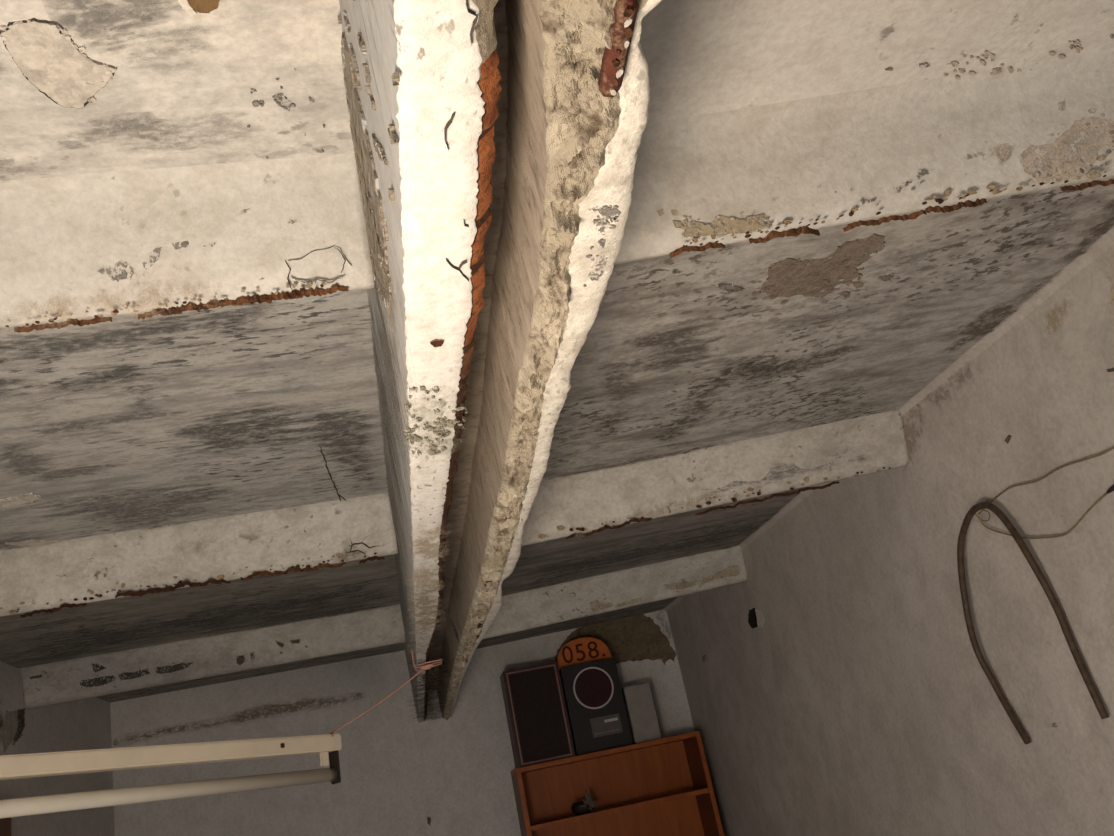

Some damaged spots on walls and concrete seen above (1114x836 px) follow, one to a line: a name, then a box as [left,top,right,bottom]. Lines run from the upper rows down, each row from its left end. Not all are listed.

peeling [0,18,117,109]
corrosion [598,0,639,98]
peeling [337,10,399,308]
corrosion [669,242,726,258]
corrosion [749,226,820,244]
corrosion [843,198,987,232]
corrosion [5,281,349,333]
crack [424,0,548,721]
spalling [442,0,622,720]
peeling [403,386,468,456]
corrosion [115,556,385,599]
spalling [555,597,676,665]